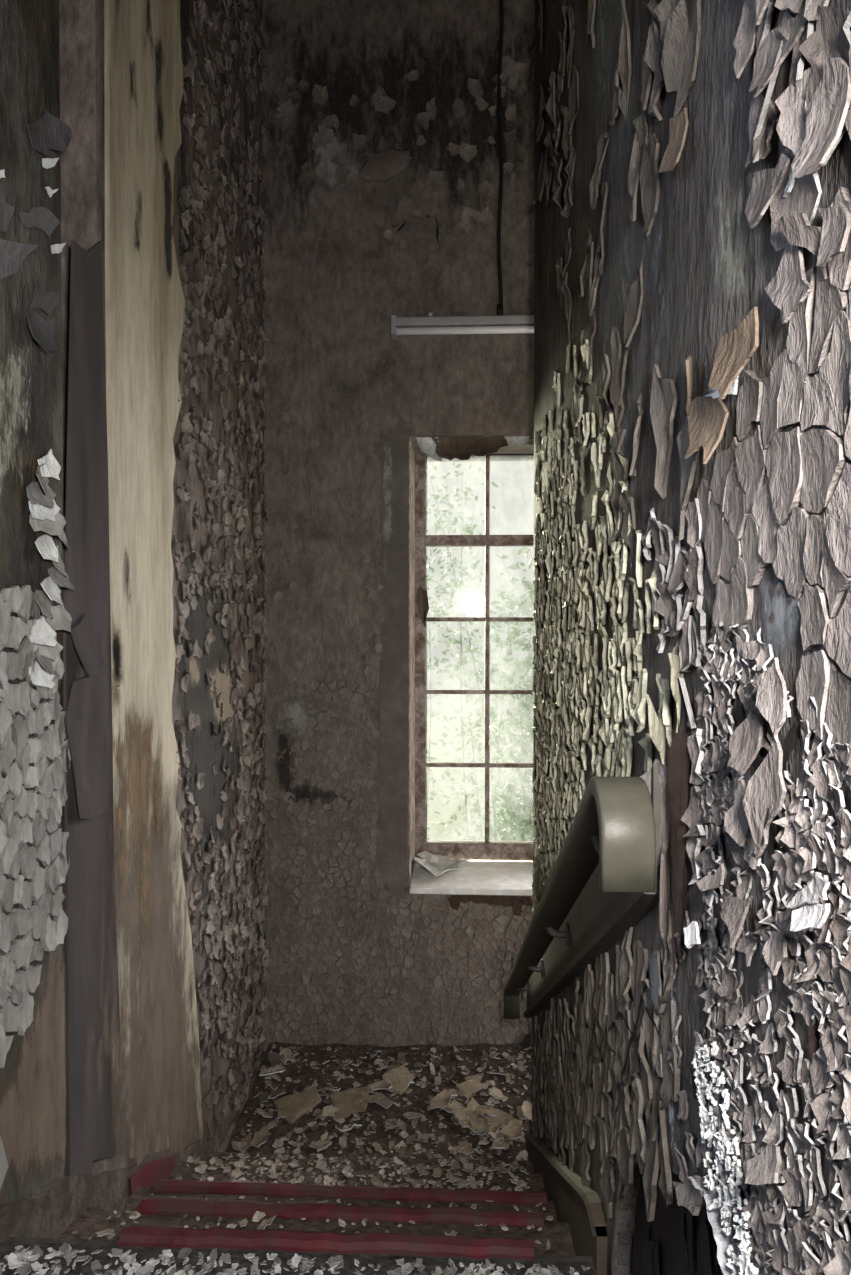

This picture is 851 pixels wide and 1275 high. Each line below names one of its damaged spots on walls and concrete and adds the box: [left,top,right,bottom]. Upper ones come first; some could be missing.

peeling [0,170,66,280]
peeling [26,289,61,354]
peeling [27,111,72,169]
peeling [407,96,436,164]
peeling [173,0,375,1153]
peeling [416,0,851,1275]
peeling [0,449,109,1197]
crack [267,671,680,1222]
flaking render [351,1052,532,1159]
leakage [668,961,759,1275]